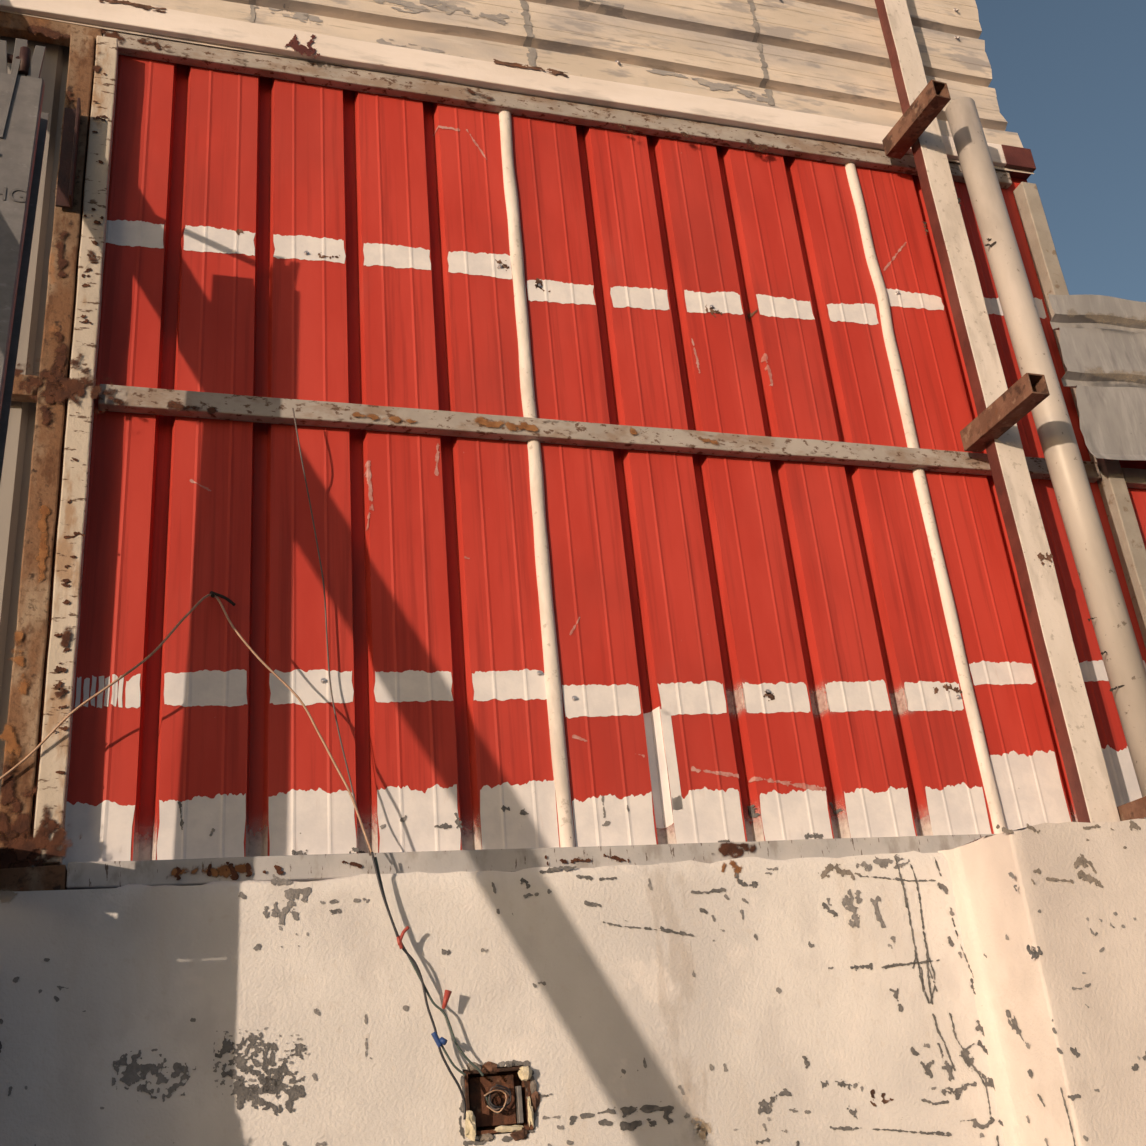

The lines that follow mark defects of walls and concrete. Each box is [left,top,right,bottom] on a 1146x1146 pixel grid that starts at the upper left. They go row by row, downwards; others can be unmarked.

corrosion [53,627,71,733]
corrosion [0,724,81,869]
corrosion [171,862,284,880]
corrosion [545,854,630,866]
corrosion [712,842,756,879]
peeling [691,867,778,920]
peeling [818,854,910,949]
crack [859,857,999,1146]
peeling [213,1027,317,1116]
peeling [756,1088,811,1144]
peeling [821,1079,894,1107]
peeling [911,1020,995,1105]